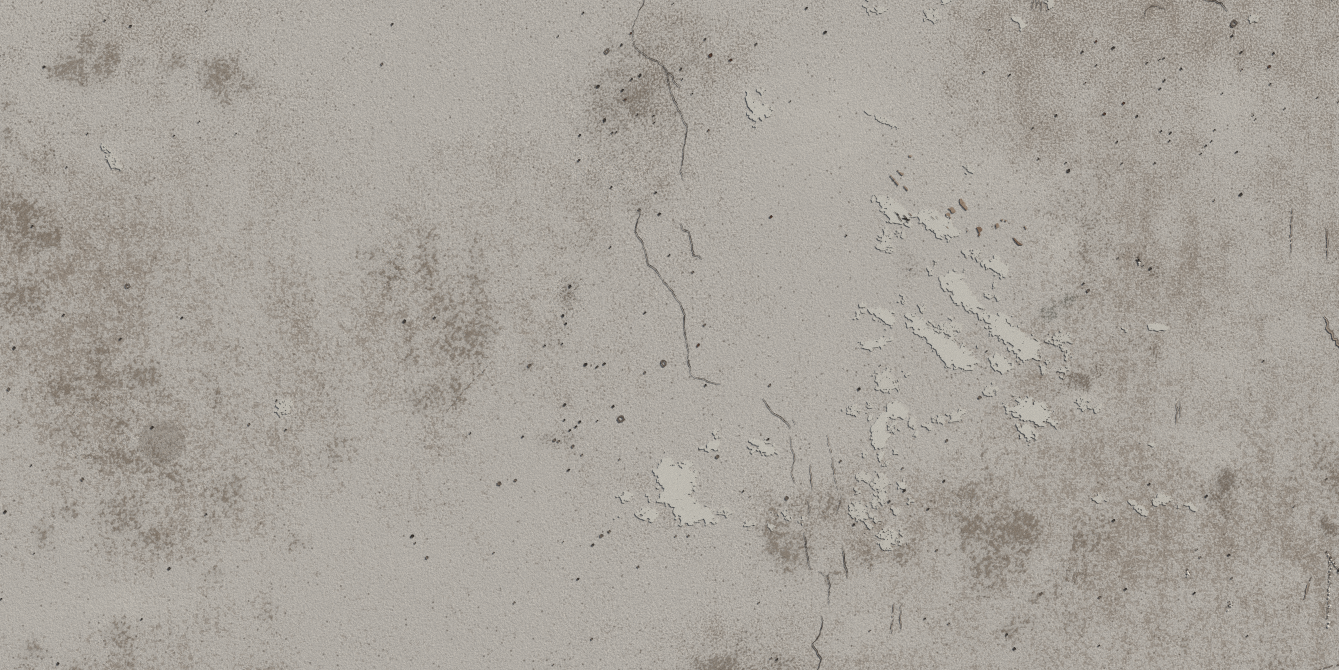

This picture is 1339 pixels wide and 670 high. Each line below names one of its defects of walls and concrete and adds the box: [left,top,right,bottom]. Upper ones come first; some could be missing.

crack [633,0,688,175]
crack [635,211,719,384]
peeling [853,194,1074,445]
peeling [614,430,805,531]
crack [763,398,848,669]
peeling [841,367,966,550]